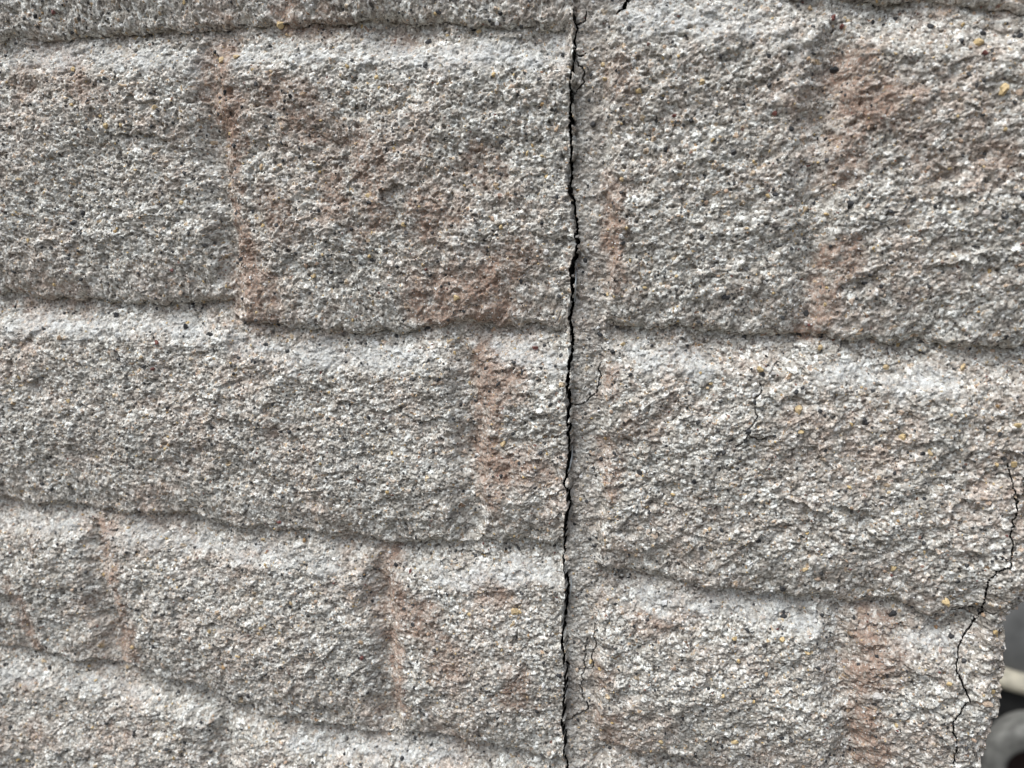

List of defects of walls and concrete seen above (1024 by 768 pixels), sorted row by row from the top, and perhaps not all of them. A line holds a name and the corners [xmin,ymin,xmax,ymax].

crack [561,9,602,768]
crack [951,463,1024,765]